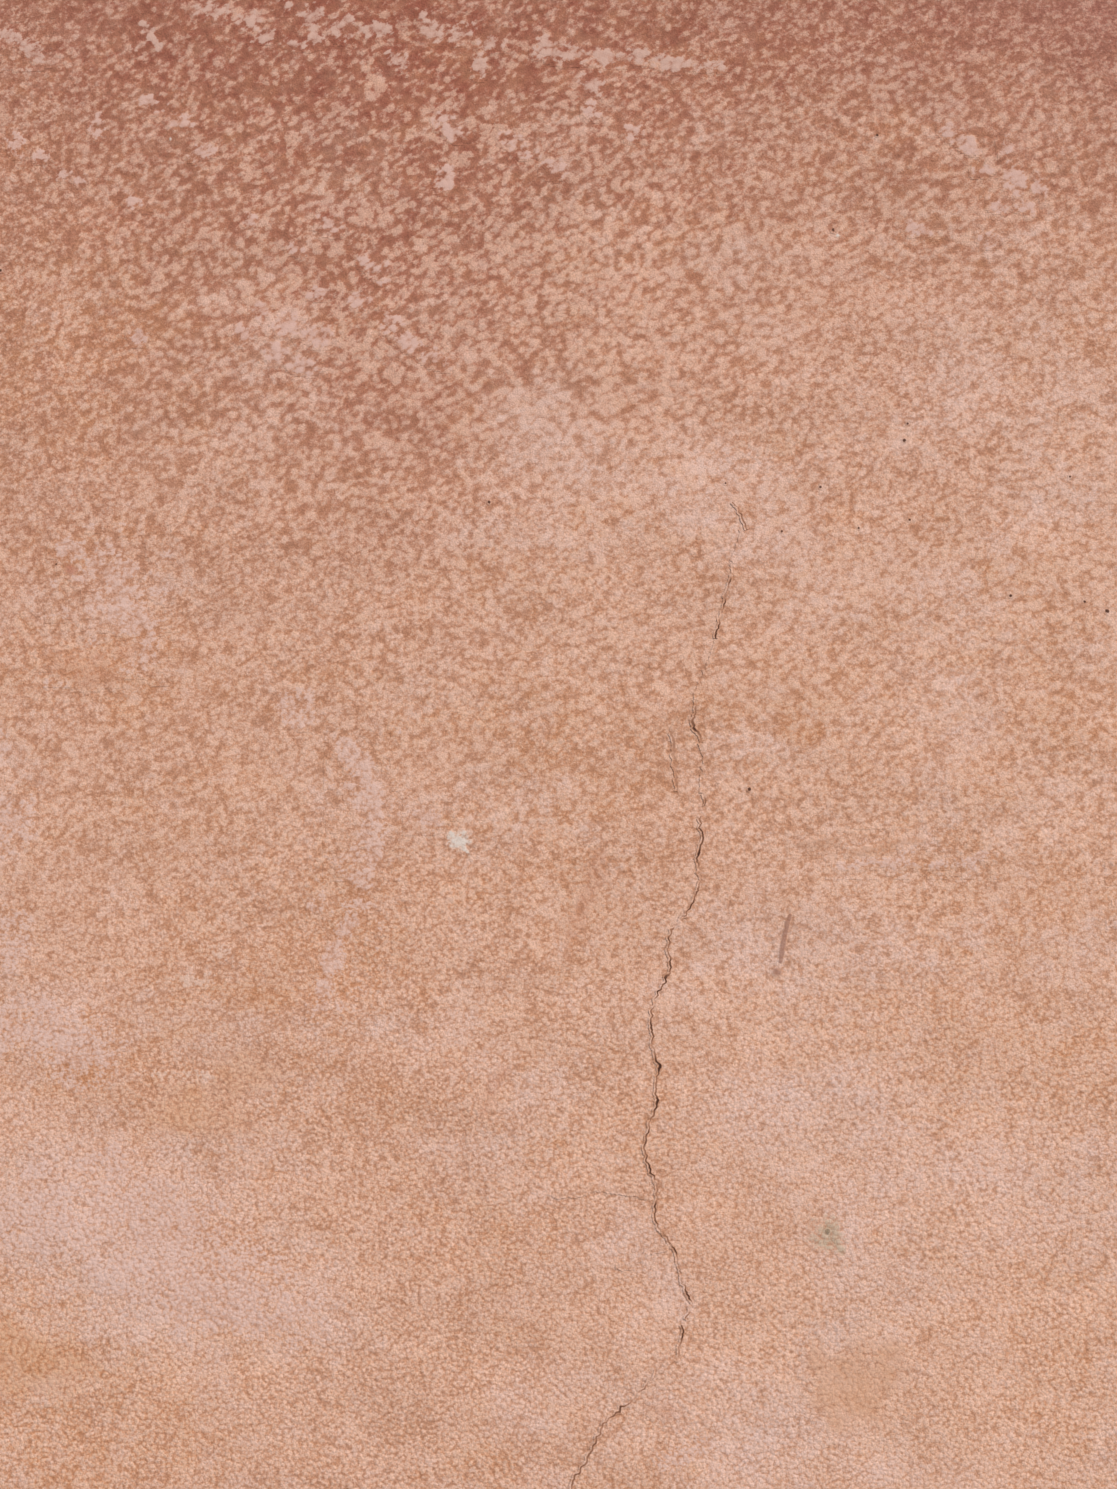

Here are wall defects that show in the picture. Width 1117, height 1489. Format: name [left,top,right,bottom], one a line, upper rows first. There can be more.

crack [552,501,749,1489]